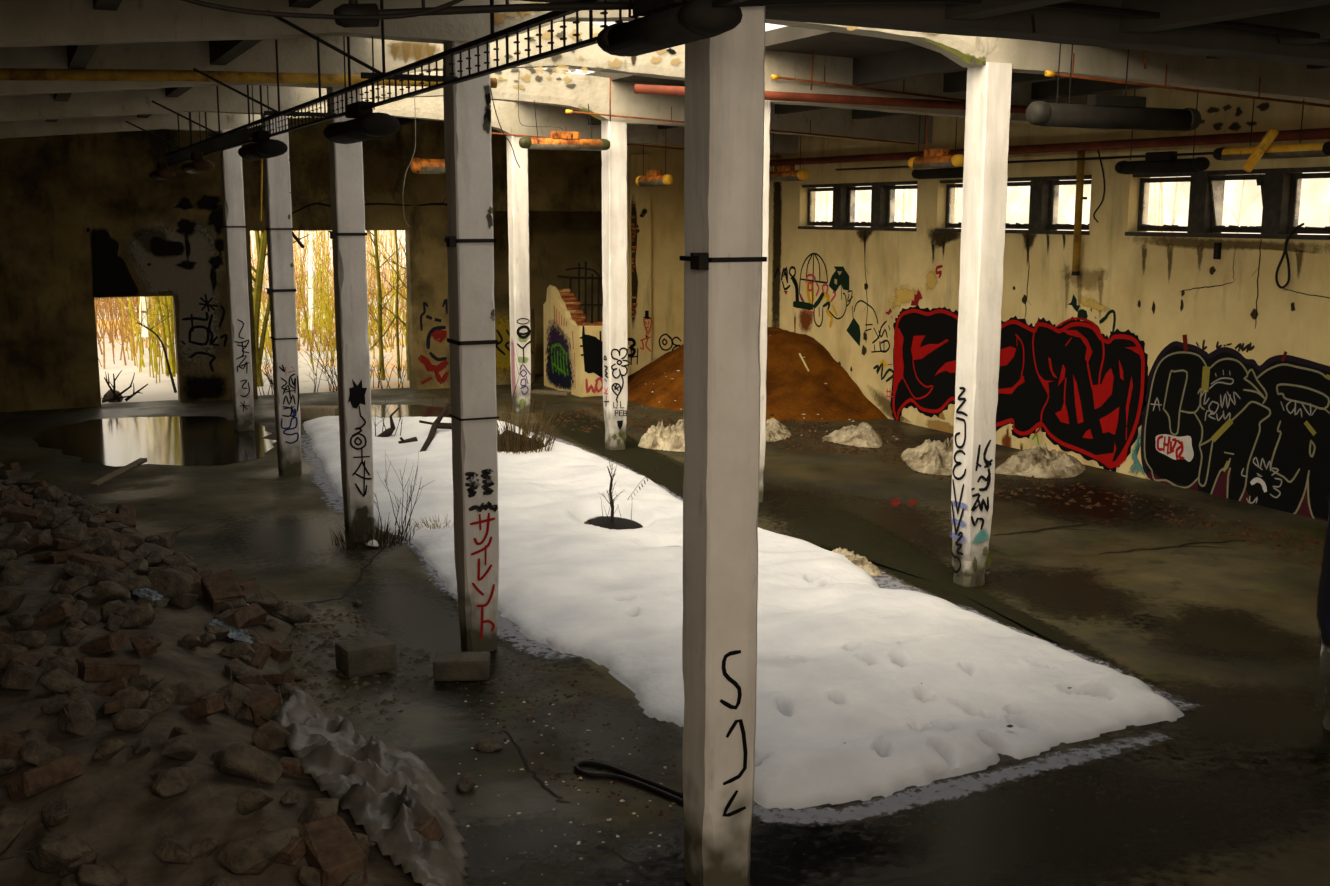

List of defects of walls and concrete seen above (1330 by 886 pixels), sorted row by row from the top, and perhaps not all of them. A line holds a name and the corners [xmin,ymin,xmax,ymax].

peeling [494,2,542,24]
peeling [651,48,681,65]
spalling [483,29,622,134]
water stain [857,230,874,258]
water stain [929,228,960,262]
water stain [1022,234,1065,263]
water stain [1142,237,1318,278]